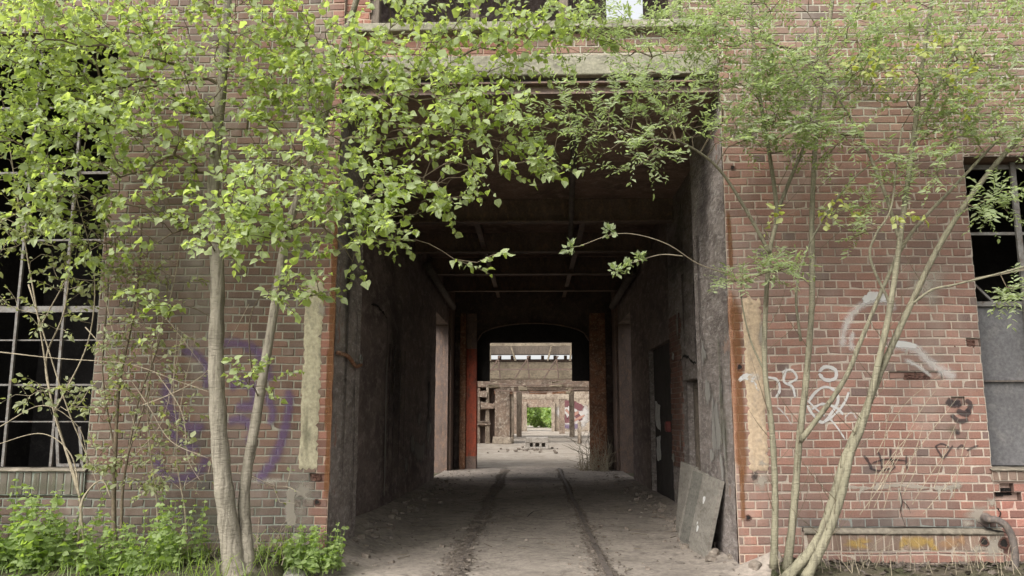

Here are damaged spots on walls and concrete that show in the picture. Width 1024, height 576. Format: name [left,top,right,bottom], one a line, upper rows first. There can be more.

rust [728,297,746,519]